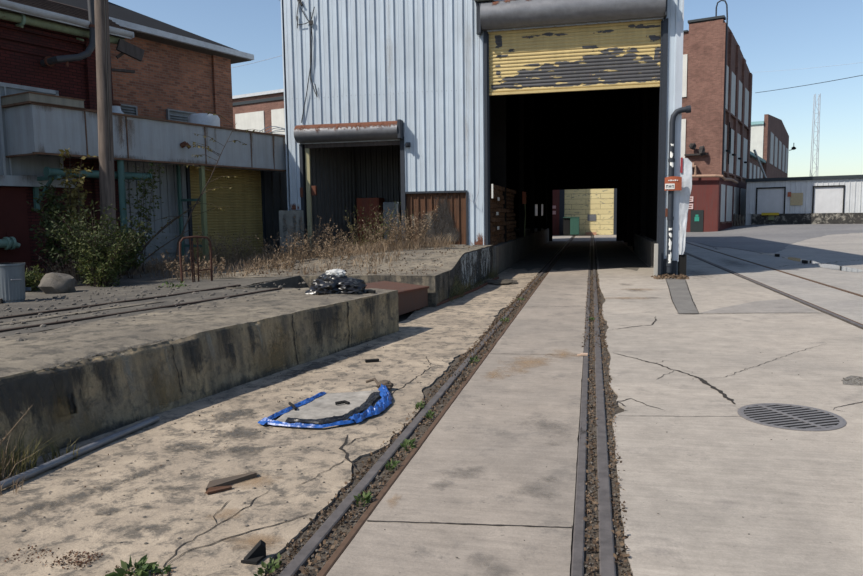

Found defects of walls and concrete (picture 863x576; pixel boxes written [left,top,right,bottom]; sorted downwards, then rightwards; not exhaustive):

peeling [491,24,661,90]
rust [294,121,397,131]
water stain [0,358,113,427]
water stain [181,338,201,367]
water stain [268,352,330,378]
crack [615,345,820,404]
water stain [211,409,263,452]
crack [296,435,371,486]
crack [163,492,318,576]